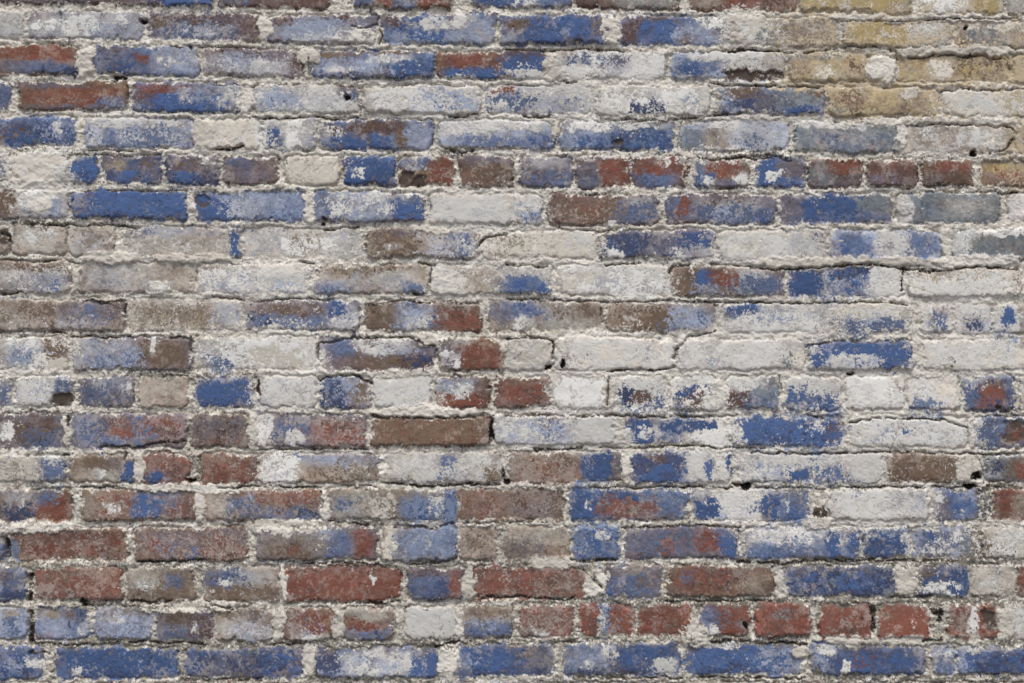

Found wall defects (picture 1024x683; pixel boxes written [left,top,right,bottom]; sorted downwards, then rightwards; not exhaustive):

flaking render [0,126,996,677]